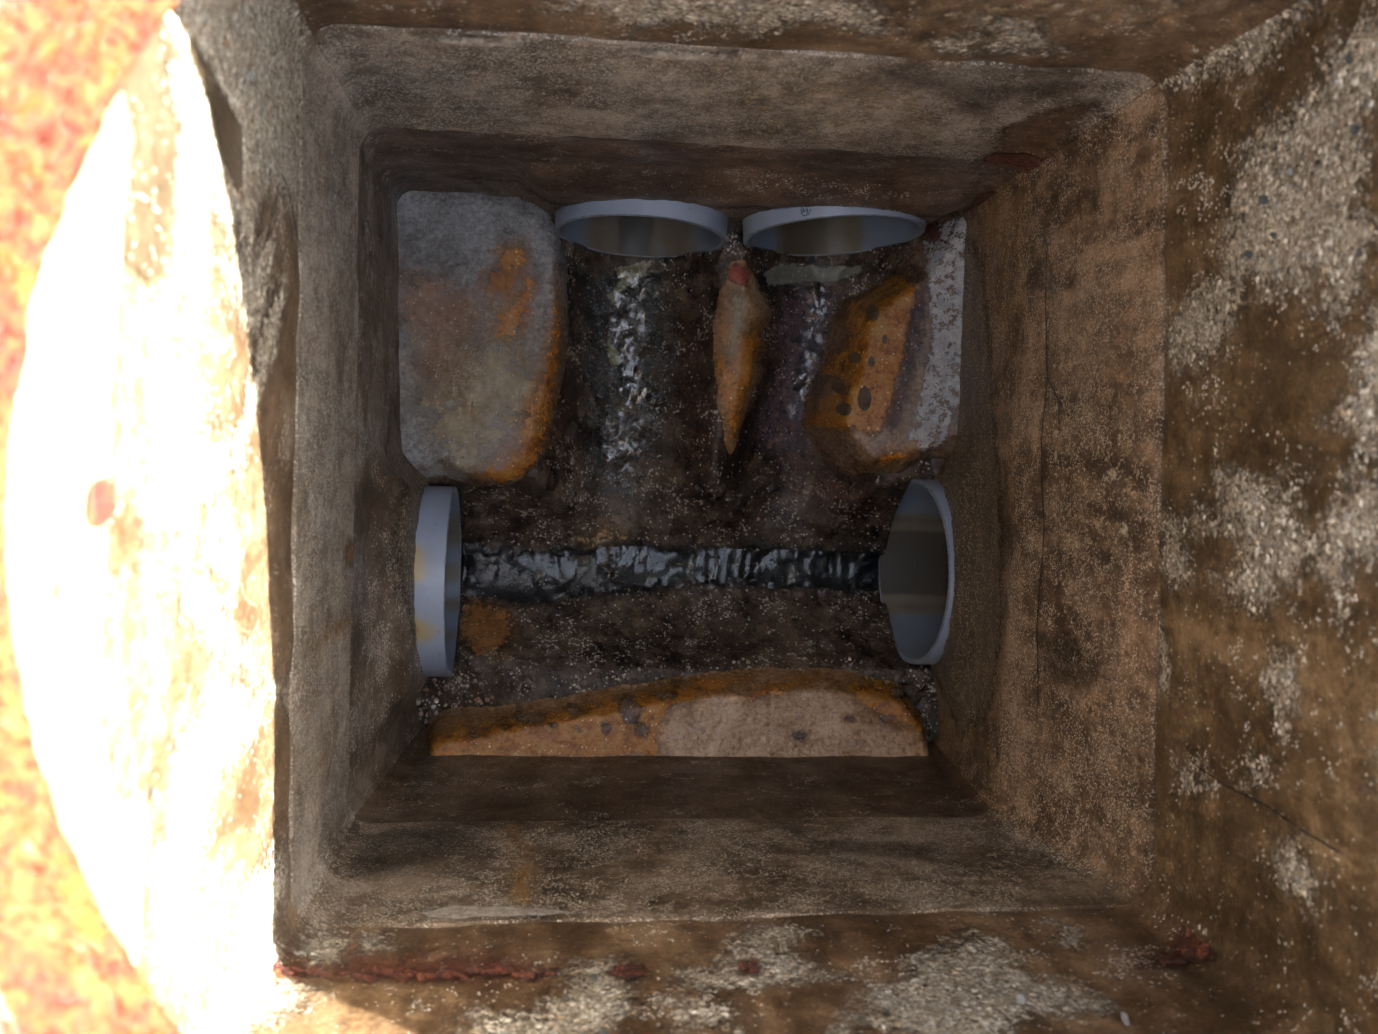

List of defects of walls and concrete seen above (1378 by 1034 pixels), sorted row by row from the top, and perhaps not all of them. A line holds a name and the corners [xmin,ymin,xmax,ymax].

water stain [907,0,1211,25]
water stain [116,19,244,511]
rust [465,241,567,487]
water stain [530,269,727,496]
rust [714,315,768,447]
water stain [748,285,872,509]
rust [801,271,918,469]
water stain [461,524,885,606]
rust [426,668,925,757]
rust [274,935,558,983]